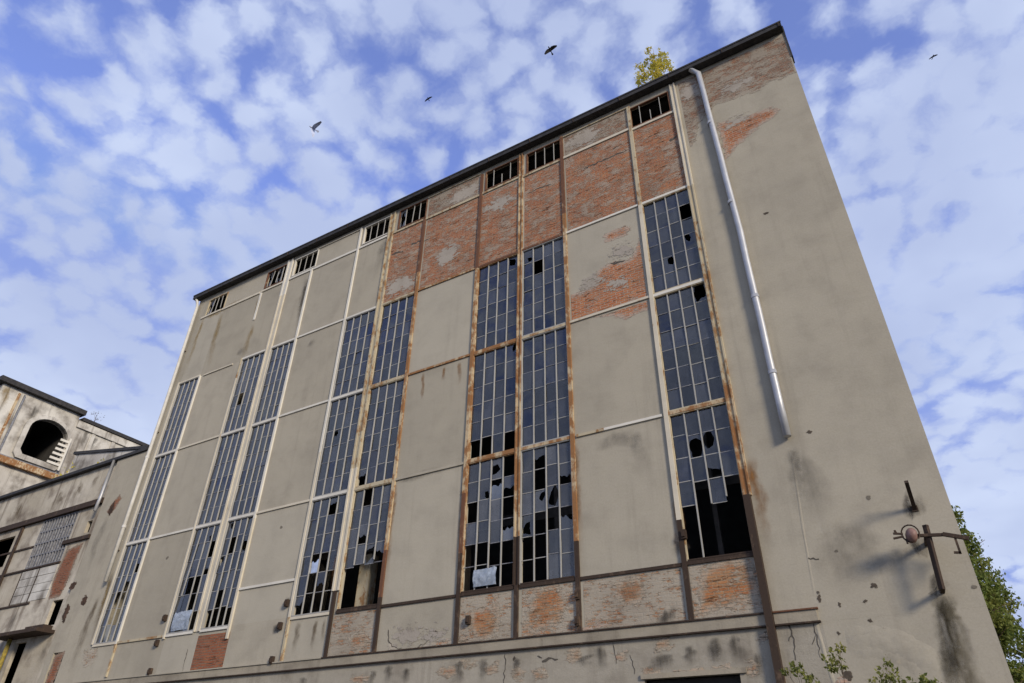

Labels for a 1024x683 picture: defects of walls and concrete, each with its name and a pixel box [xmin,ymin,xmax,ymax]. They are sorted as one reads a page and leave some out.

spalling [383,36,797,303]
spalling [571,225,649,320]
spalling [387,558,763,650]
crack [788,624,820,660]
leakage [939,602,973,683]